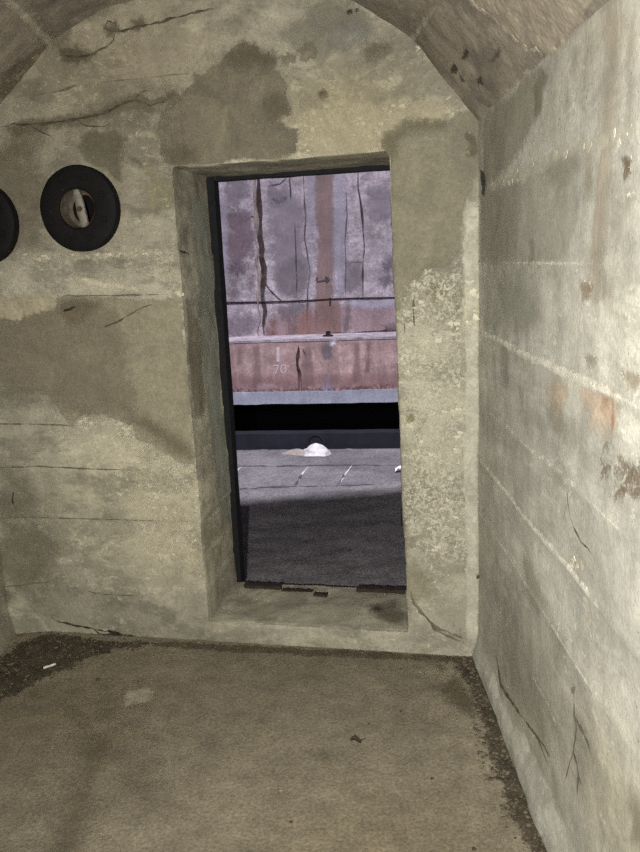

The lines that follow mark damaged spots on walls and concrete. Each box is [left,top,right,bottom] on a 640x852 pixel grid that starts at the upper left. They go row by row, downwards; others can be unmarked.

crack [62,8,211,58]
leakage [105,5,367,165]
crack [2,90,167,137]
crack [251,176,310,389]
leakage [0,195,230,521]
rust [233,384,394,392]
crack [52,618,133,636]
crack [411,594,464,643]
crack [496,658,590,803]